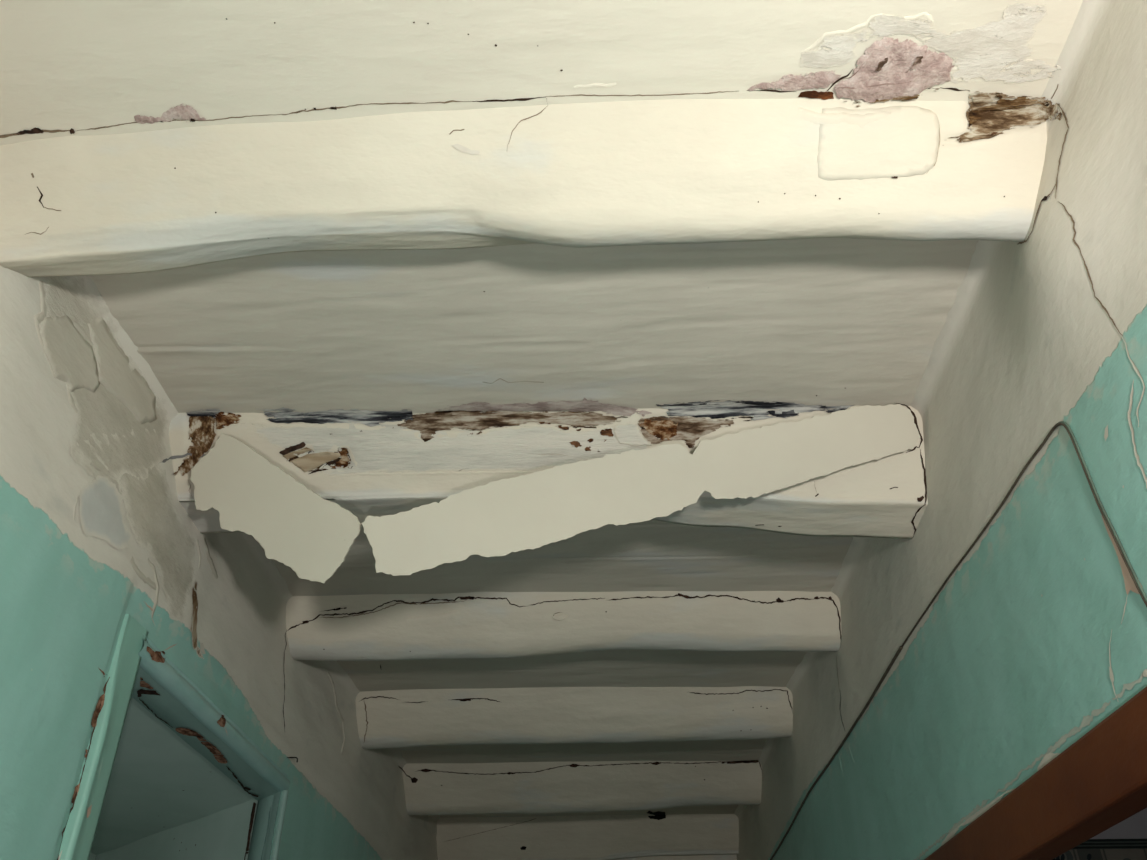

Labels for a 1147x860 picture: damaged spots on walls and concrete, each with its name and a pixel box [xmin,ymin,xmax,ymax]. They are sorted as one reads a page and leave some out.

peeling [747,3,1068,143]
crack [0,82,734,148]
crack [1018,84,1147,488]
peeling [34,276,196,625]
leakage [186,409,220,418]
leakage [256,407,413,427]
flaking render [190,404,920,583]
peeling [1101,515,1142,595]
peeling [145,639,176,663]
crack [283,593,844,729]
crack [399,760,763,783]